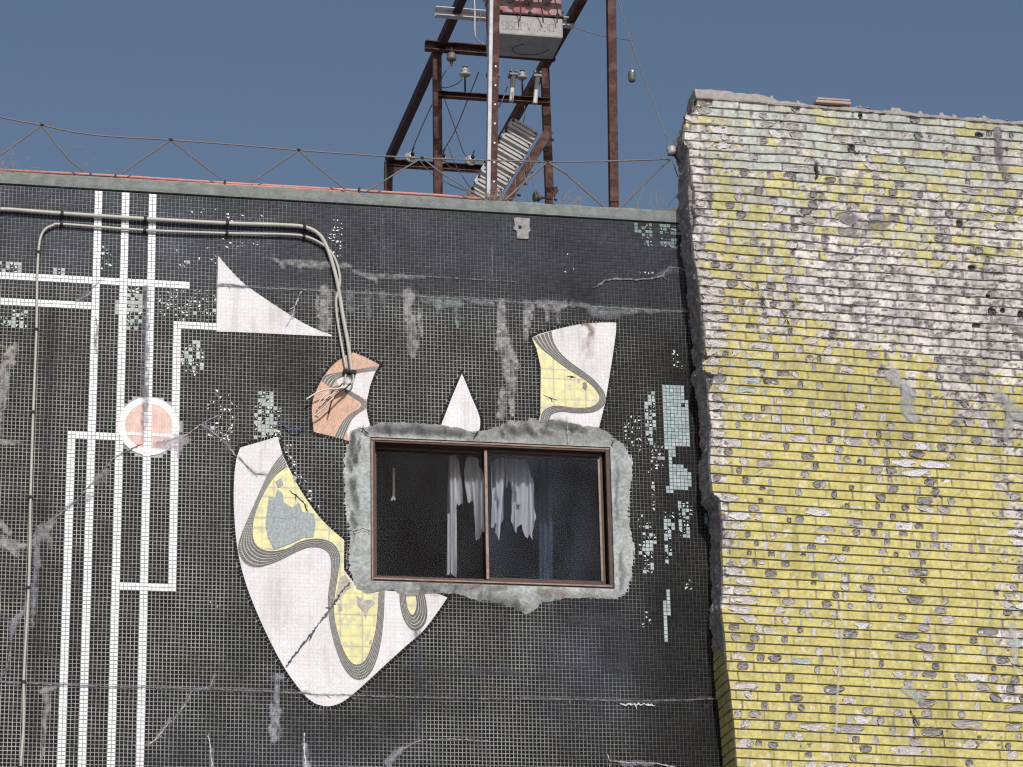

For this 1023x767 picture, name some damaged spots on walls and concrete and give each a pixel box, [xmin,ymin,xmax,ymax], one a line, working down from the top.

peeling [634,222,681,249]
spalling [837,147,1023,242]
water stain [316,286,371,331]
water stain [404,290,587,436]
peeling [624,385,693,573]
spalling [695,243,956,670]
crack [286,582,350,667]
peeling [663,589,671,642]
crack [0,625,716,744]
crack [389,739,488,761]
crack [607,754,673,767]
spalling [734,659,942,767]